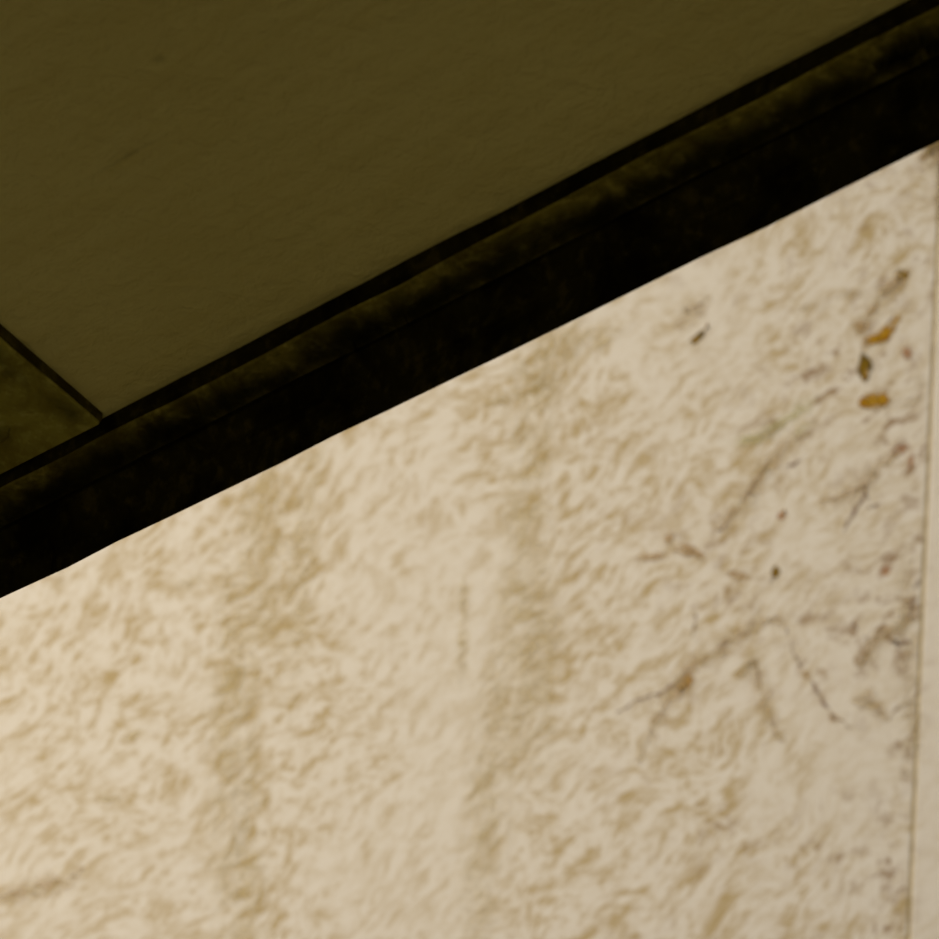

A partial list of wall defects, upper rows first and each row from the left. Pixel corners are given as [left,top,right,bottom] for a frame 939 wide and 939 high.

corrosion [855,315,900,344]
corrosion [859,392,890,408]